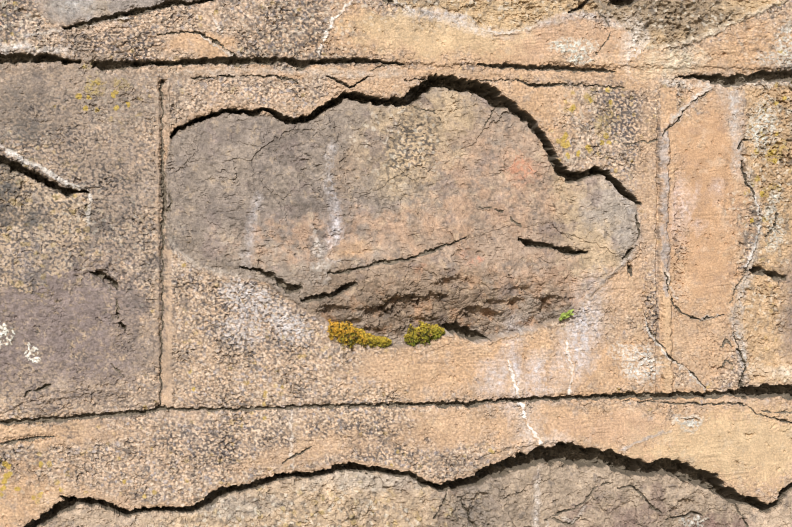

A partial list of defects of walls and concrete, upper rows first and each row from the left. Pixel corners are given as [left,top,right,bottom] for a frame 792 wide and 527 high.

crack [21,0,215,38]
crack [382,0,413,14]
crack [0,144,93,227]
spalling [164,87,637,347]
crack [170,61,642,277]
crack [239,237,467,303]
crack [622,139,792,424]
crack [24,441,792,527]